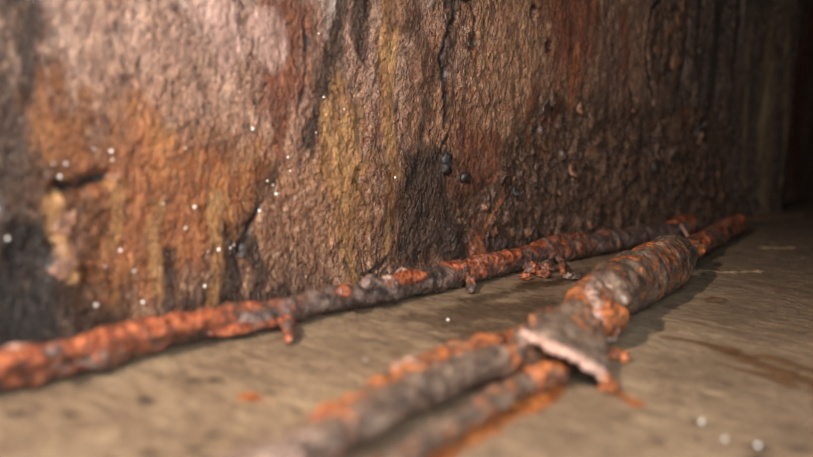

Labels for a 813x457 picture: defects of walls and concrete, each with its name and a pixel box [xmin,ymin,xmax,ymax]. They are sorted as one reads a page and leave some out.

crack [438,1,476,65]
corrosion [377,0,400,254]
crack [435,89,448,162]
crack [51,172,107,193]
corrosion [0,0,316,382]
corrosion [320,71,368,285]
crack [236,206,259,254]
corrosion [387,269,429,287]
corrosion [453,232,587,294]
corrosion [689,239,706,258]
corrosion [492,308,554,349]
corrosion [592,300,631,363]